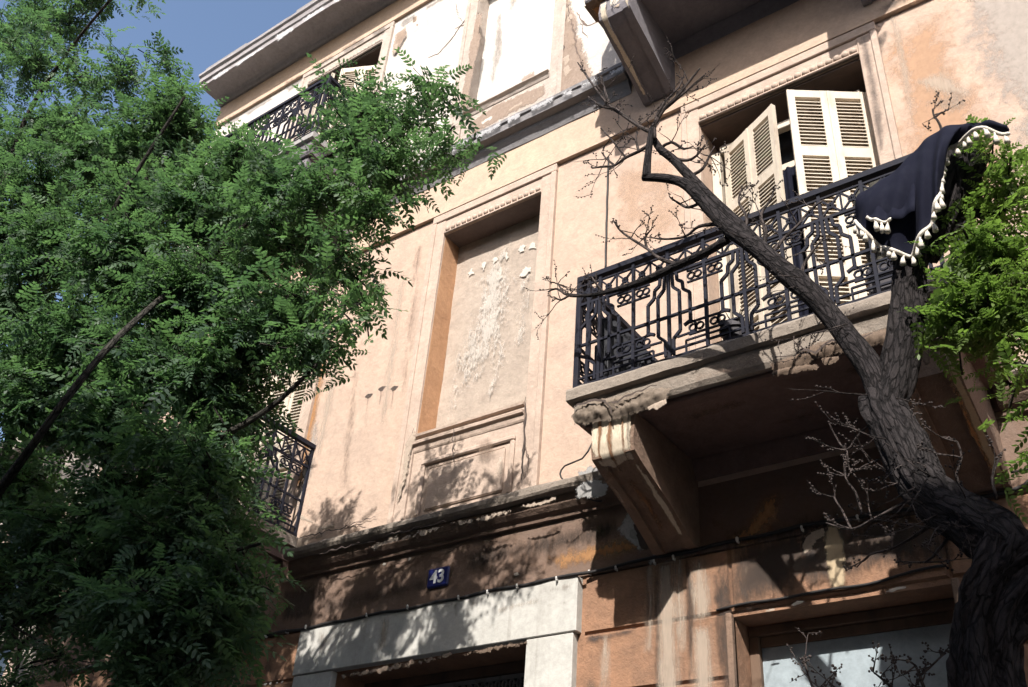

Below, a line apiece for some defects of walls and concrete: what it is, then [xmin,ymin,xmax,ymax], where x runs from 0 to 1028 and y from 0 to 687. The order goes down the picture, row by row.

flaking render [392,16,418,53]
crack [428,5,479,58]
peeling [561,0,645,95]
peeling [455,239,536,389]
spalling [771,336,843,376]
spalling [861,328,886,346]
crack [521,397,529,480]
peeling [578,413,683,535]
flaking render [296,515,369,547]
flaking render [320,511,507,554]
flaking render [802,526,845,587]
damp [649,554,730,687]